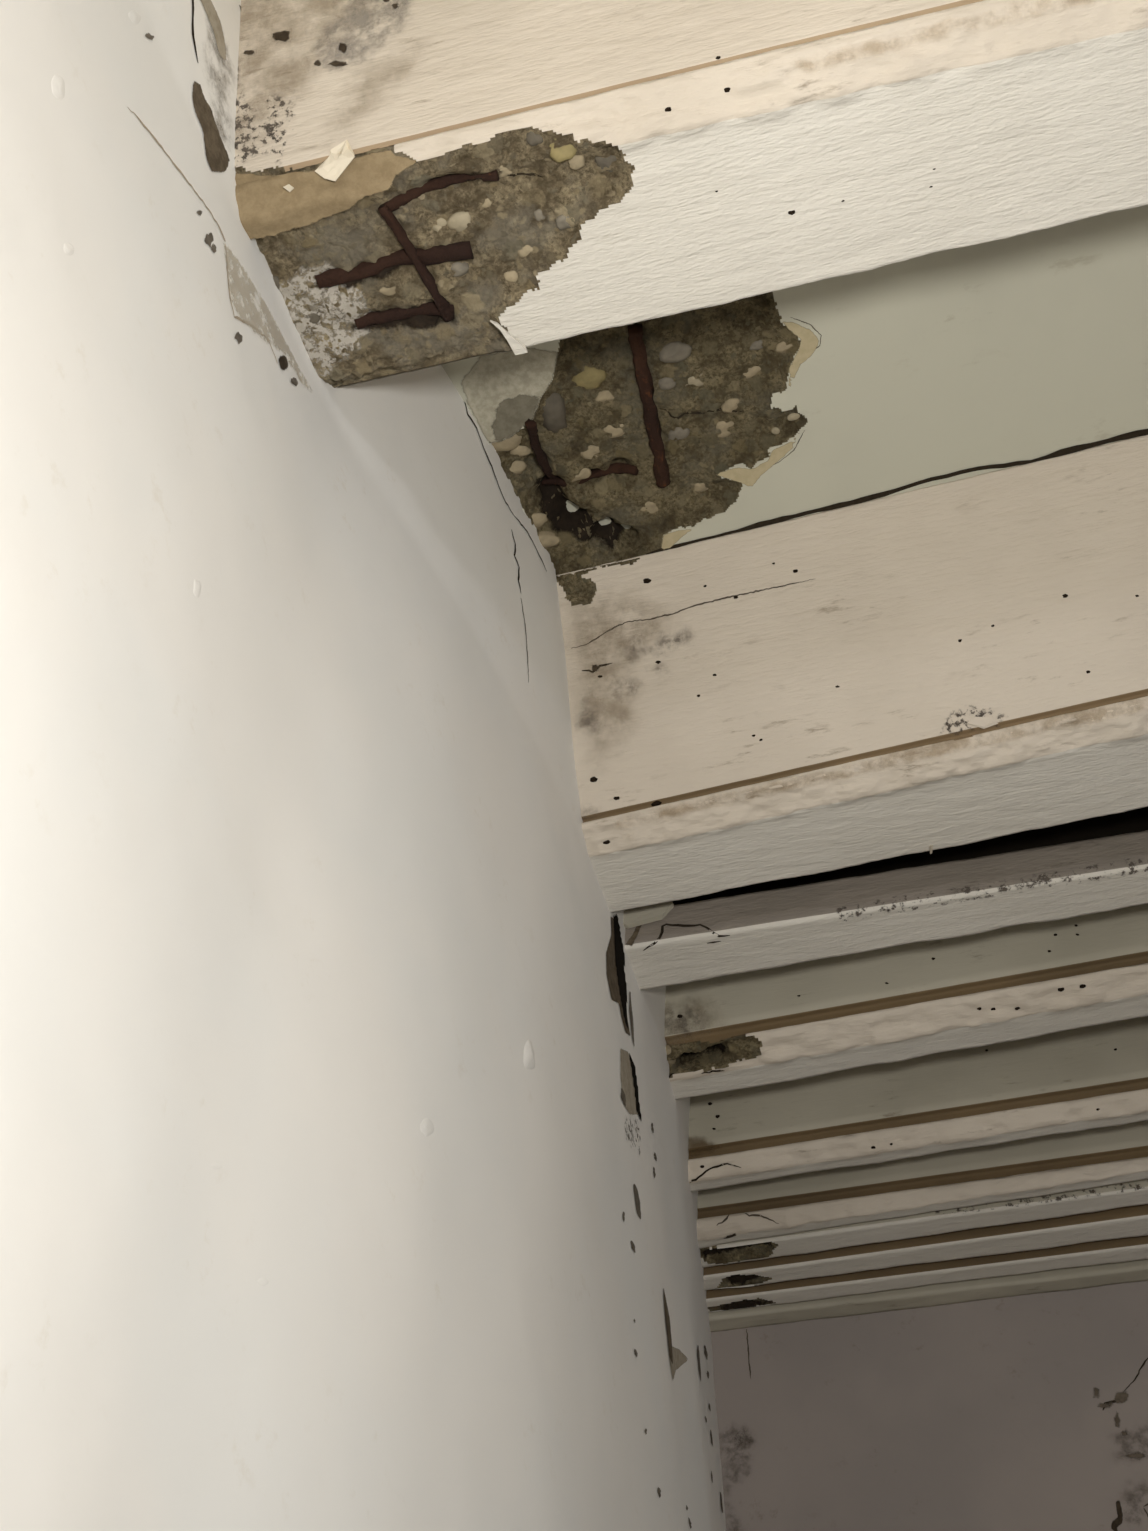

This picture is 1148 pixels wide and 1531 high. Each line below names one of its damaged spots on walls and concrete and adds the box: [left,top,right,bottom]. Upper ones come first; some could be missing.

peeling [201,0,226,60]
damp [273,31,289,42]
damp [314,0,407,66]
damp [213,45,293,161]
spalling [192,81,822,606]
crack [646,429,1148,555]
flaking render [606,914,657,1178]
spalling [666,1035,762,1078]
peeling [623,1184,641,1221]
spalling [700,1242,778,1311]
peeling [664,1292,709,1380]
crack [1103,1358,1148,1410]